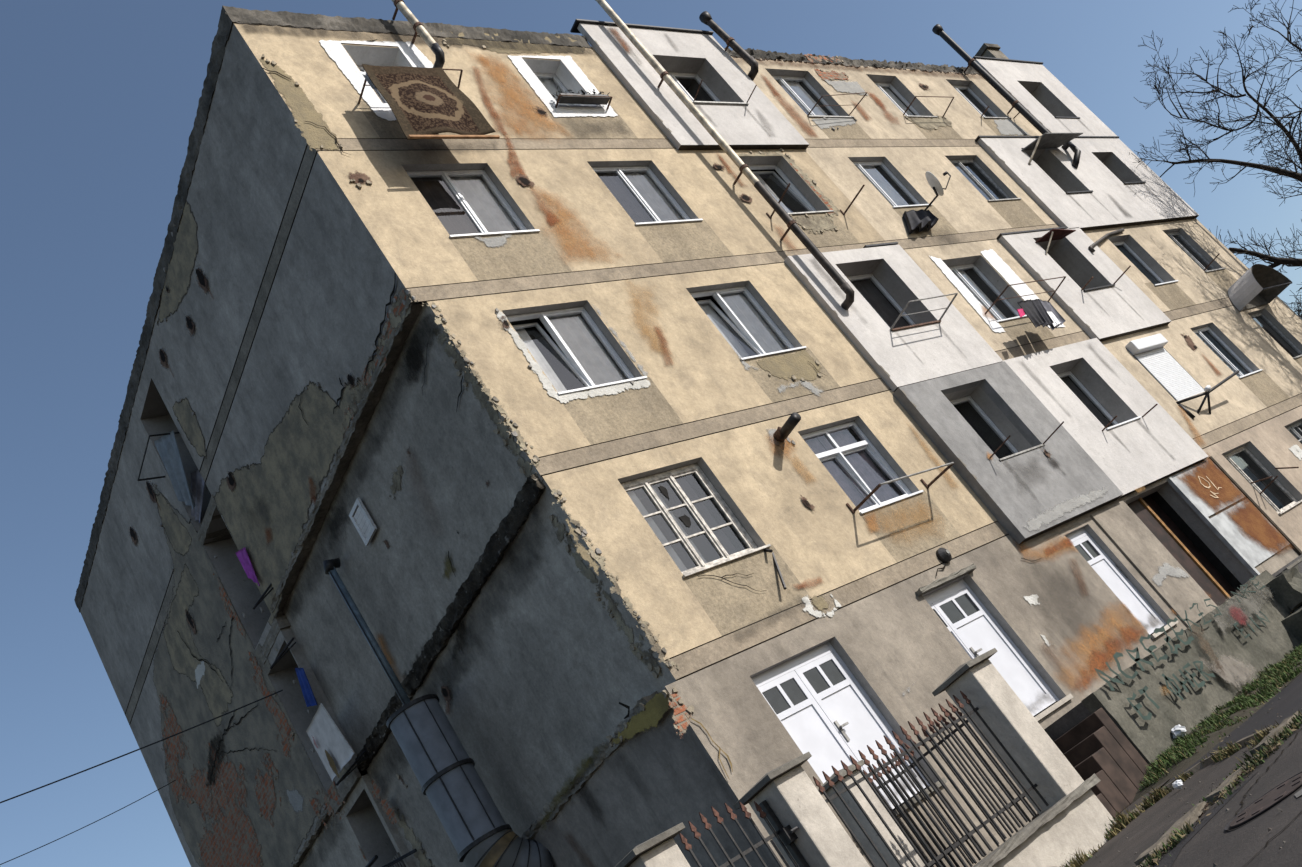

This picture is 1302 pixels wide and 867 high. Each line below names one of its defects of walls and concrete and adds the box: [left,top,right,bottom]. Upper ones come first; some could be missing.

peeling [260,54,343,152]
rust [475,56,555,176]
peeling [156,201,211,336]
rust [543,194,595,257]
peeling [146,273,540,867]
peeling [549,489,694,747]
rust [1020,537,1075,557]
rust [1068,604,1141,685]
rust [1182,457,1291,553]